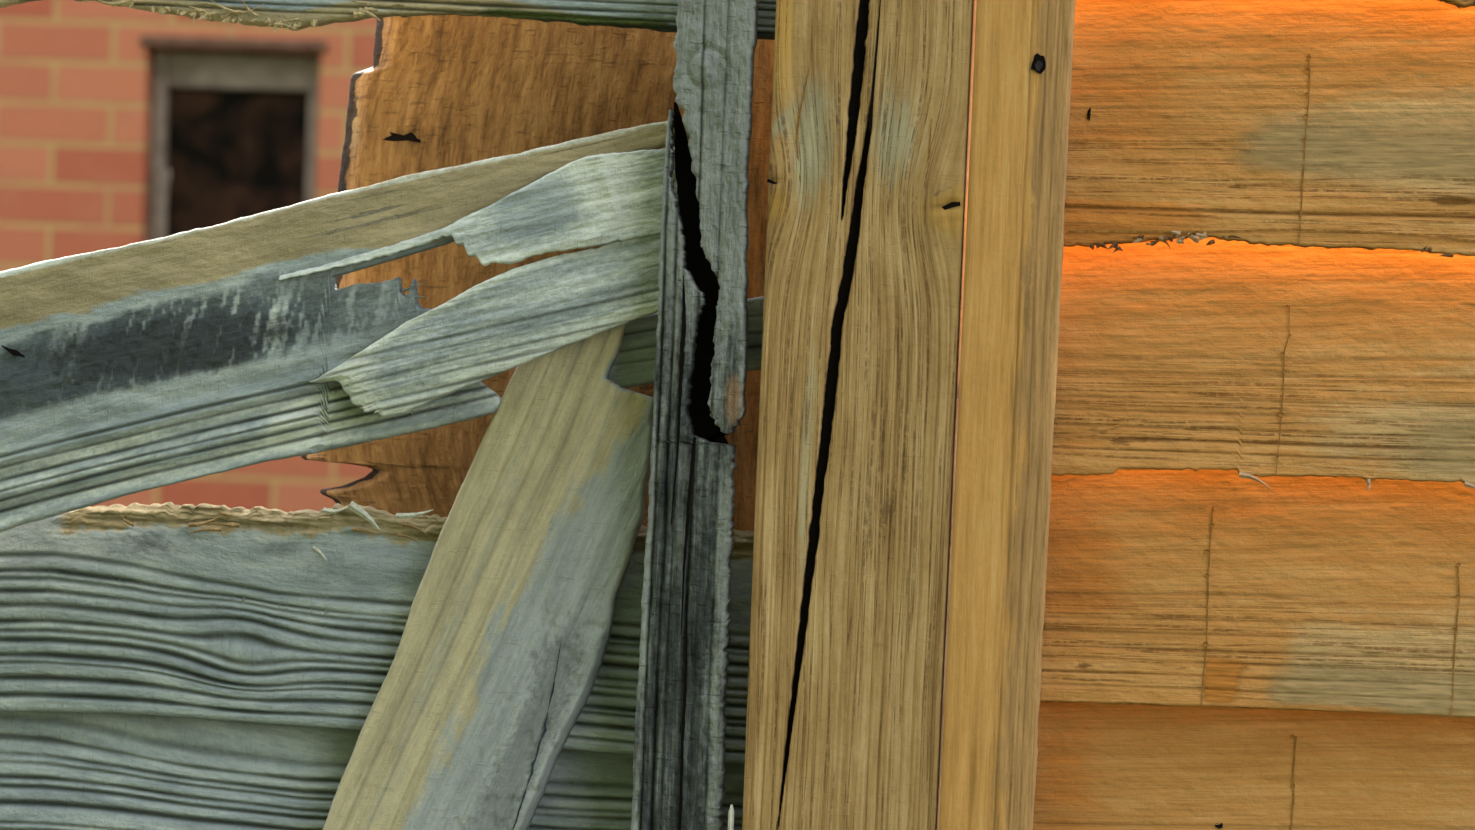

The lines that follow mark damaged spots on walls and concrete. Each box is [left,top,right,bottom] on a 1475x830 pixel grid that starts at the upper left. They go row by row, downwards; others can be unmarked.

crack [767,69,809,185]
crack [1068,54,1475,244]
crack [776,0,881,830]
crack [1275,305,1291,475]
peeling [322,501,381,531]
peeling [396,509,434,519]
crack [1201,506,1214,706]
crack [1450,563,1460,715]
crack [1289,735,1297,830]